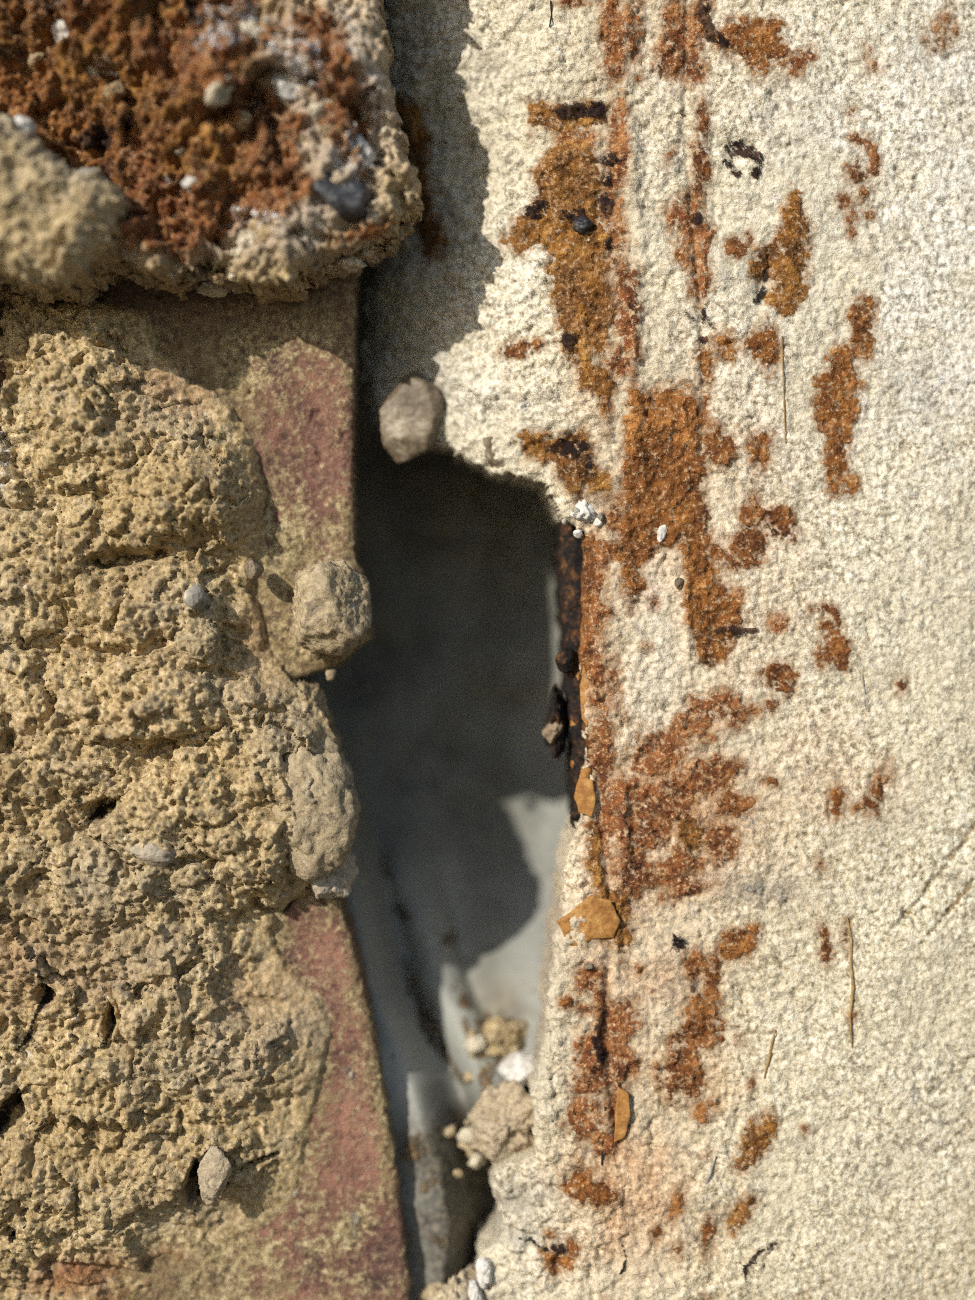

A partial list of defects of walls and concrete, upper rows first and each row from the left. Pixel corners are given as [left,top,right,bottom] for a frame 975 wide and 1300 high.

rust [0,0,374,262]
rust [837,133,881,238]
rust [810,294,879,497]
rust [498,0,817,975]
rust [809,603,853,672]
rust [826,759,894,823]
rust [818,922,848,965]
rust [558,923,763,1210]
rust [733,1111,778,1173]
rust [539,1229,580,1277]
rust [651,1182,684,1257]
rust [700,1194,756,1261]